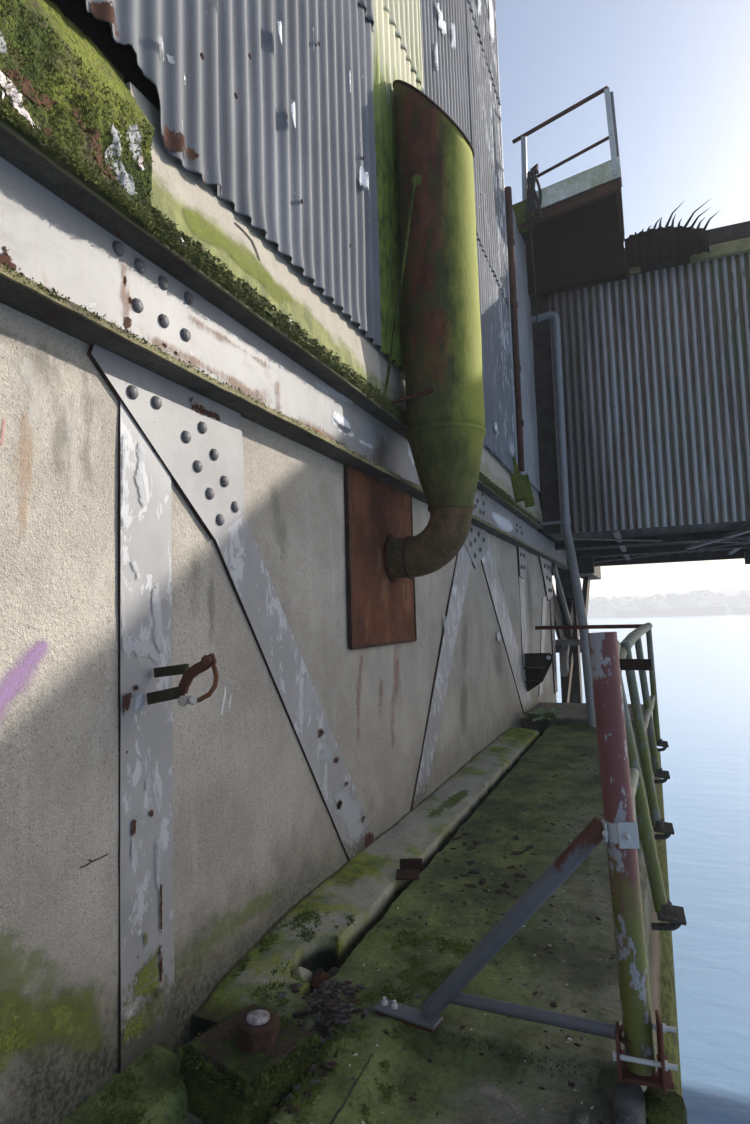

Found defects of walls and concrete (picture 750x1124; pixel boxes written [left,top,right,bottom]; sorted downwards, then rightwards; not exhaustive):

corrosion [90,1,119,37]
peeling [73,107,144,196]
corrosion [163,118,199,160]
corrosion [190,397,220,421]
peeling [123,434,147,528]
peeling [123,582,163,662]
peeling [333,788,364,840]